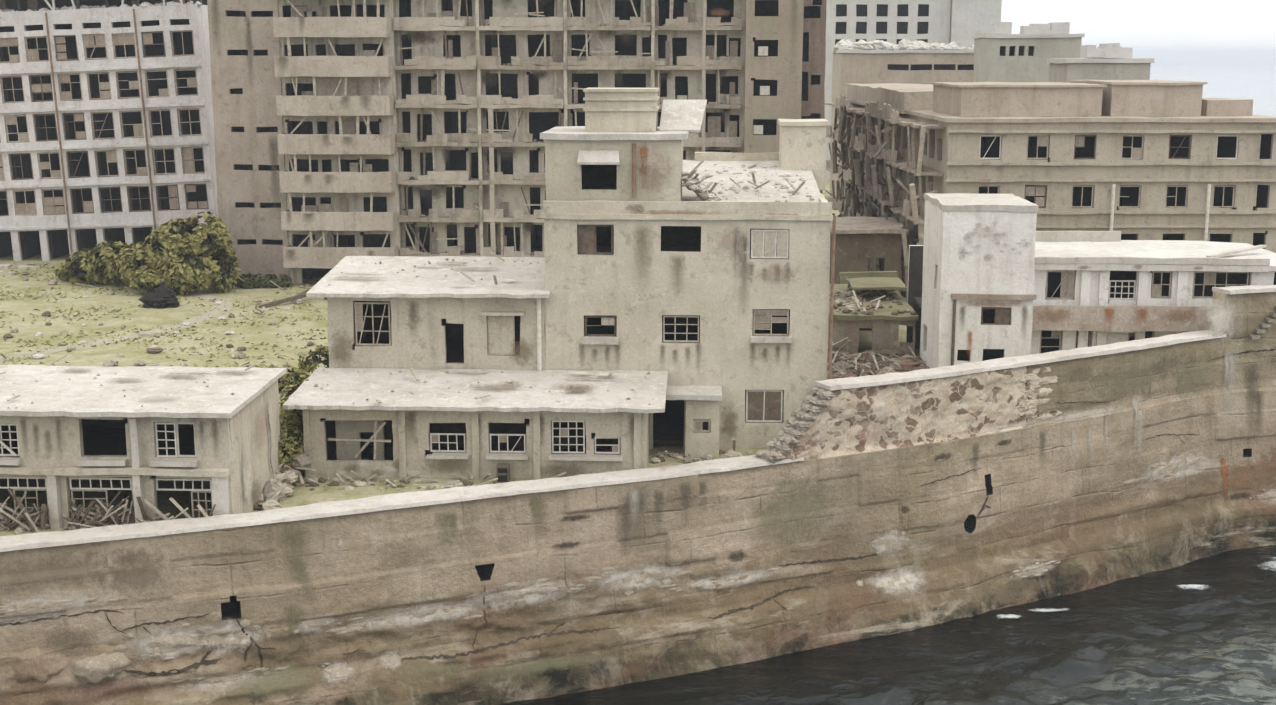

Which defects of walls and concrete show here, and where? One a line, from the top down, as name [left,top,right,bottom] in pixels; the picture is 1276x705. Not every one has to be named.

crack [1209,349,1276,361]
spalling [755,387,835,464]
crack [0,609,275,676]
crack [397,587,620,661]